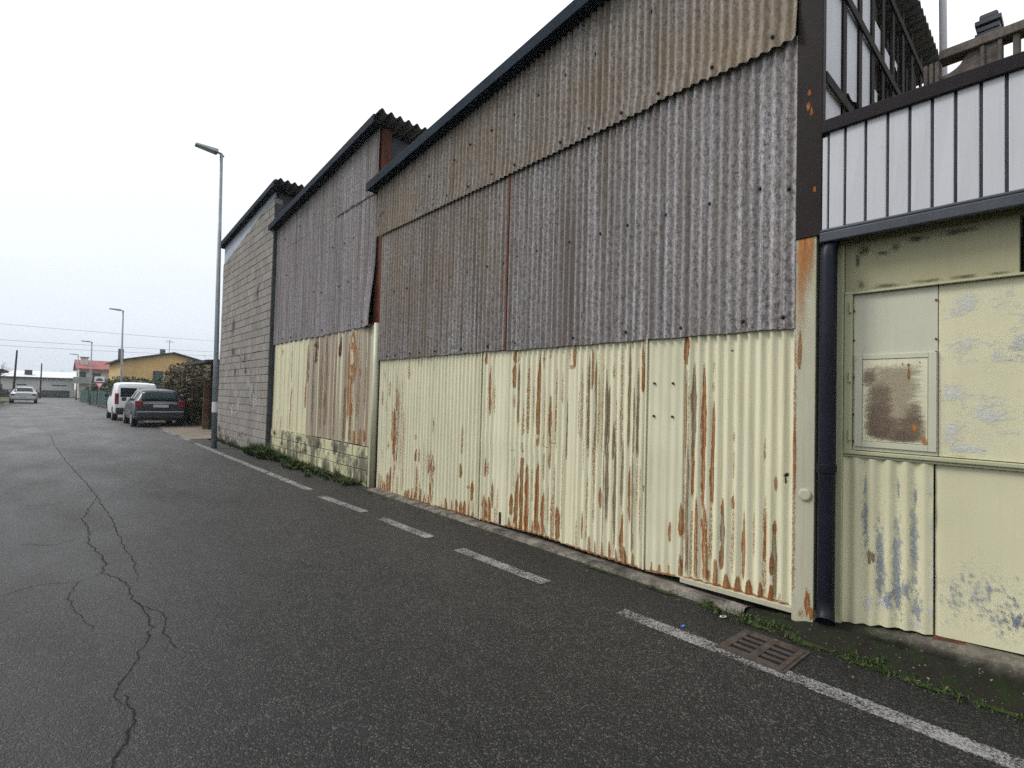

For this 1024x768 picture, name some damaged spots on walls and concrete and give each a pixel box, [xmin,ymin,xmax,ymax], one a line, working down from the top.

corrosion [797,237,813,293]
corrosion [304,331,367,444]
corrosion [378,330,813,619]
crack [1,427,177,768]
peeling [862,485,1024,643]